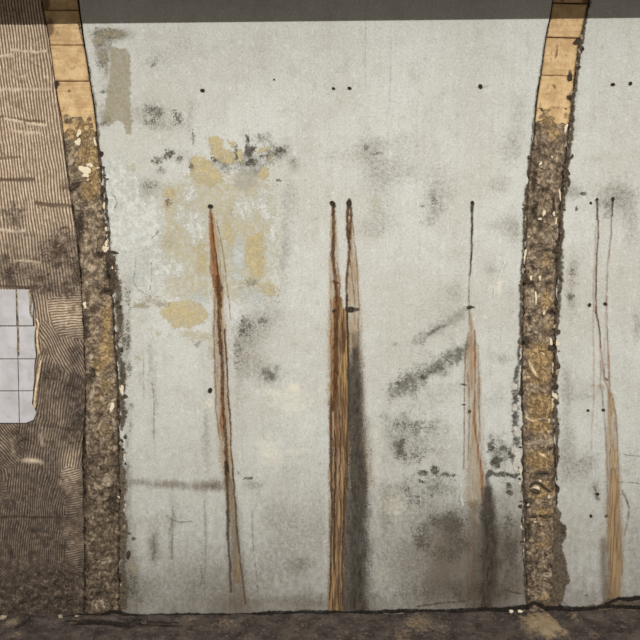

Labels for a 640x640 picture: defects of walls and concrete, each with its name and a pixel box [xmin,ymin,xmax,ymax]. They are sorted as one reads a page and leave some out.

spalling [527,26,549,176]
peeling [68,22,286,610]
corrosion [209,209,246,604]
corrosion [327,198,372,612]
damp [343,343,369,612]
damp [394,419,455,511]
damp [430,344,469,372]
damp [411,439,518,608]
corrosion [461,289,486,506]
peeling [511,184,541,475]
spalling [550,505,570,606]
corrosion [593,200,628,600]